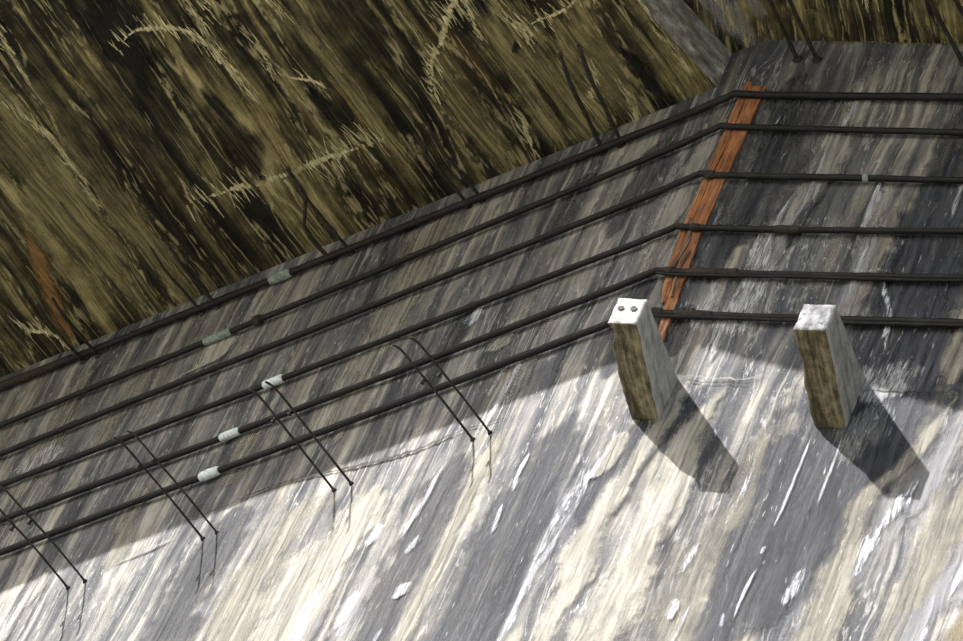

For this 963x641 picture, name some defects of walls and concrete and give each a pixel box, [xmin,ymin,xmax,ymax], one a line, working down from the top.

damp [476,0,694,159]
damp [642,129,721,267]
damp [695,65,881,283]
damp [8,371,93,507]
damp [104,485,167,570]
damp [182,335,236,375]
damp [140,432,501,641]
damp [327,206,453,445]
damp [422,385,724,641]
damp [600,328,617,378]
damp [625,274,657,300]
damp [655,113,963,641]